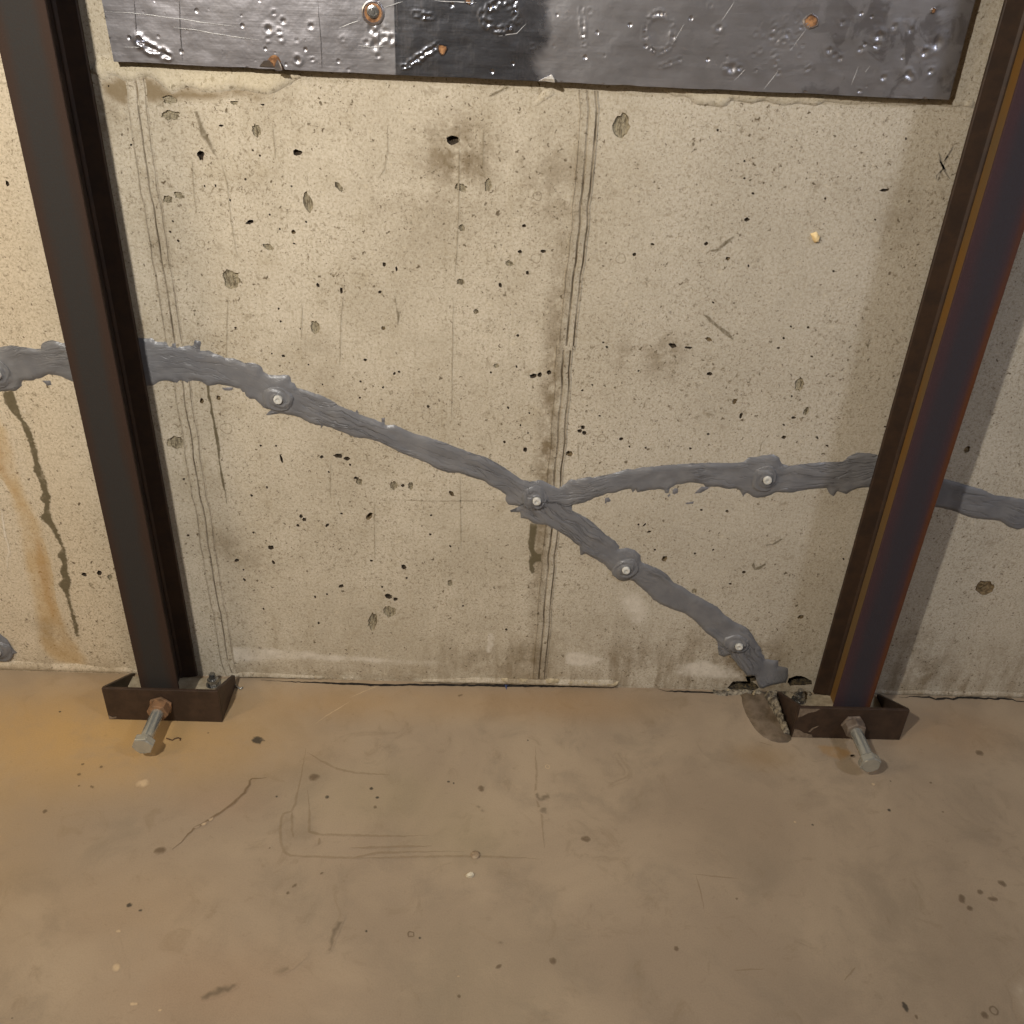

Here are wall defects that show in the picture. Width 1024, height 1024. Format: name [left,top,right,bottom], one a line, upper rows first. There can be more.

crack [448,315,456,422]
corrosion [0,413,93,666]
crack [373,483,475,554]
damp [528,523,542,574]
crack [267,680,616,688]
spalling [727,676,759,690]
spalling [788,676,812,686]